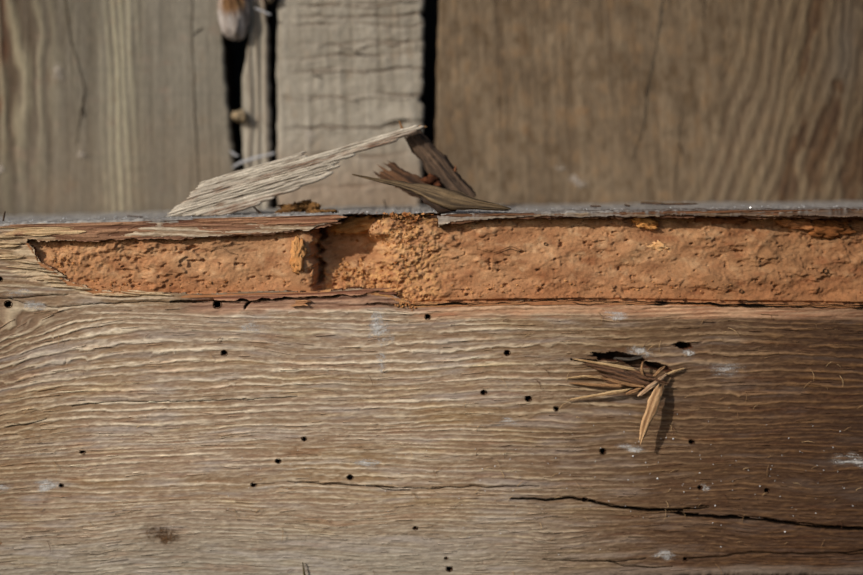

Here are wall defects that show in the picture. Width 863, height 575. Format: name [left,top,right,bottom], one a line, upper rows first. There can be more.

crack [65,0,85,141]
crack [632,0,664,160]
spalling [27,210,863,311]
crack [288,481,863,568]